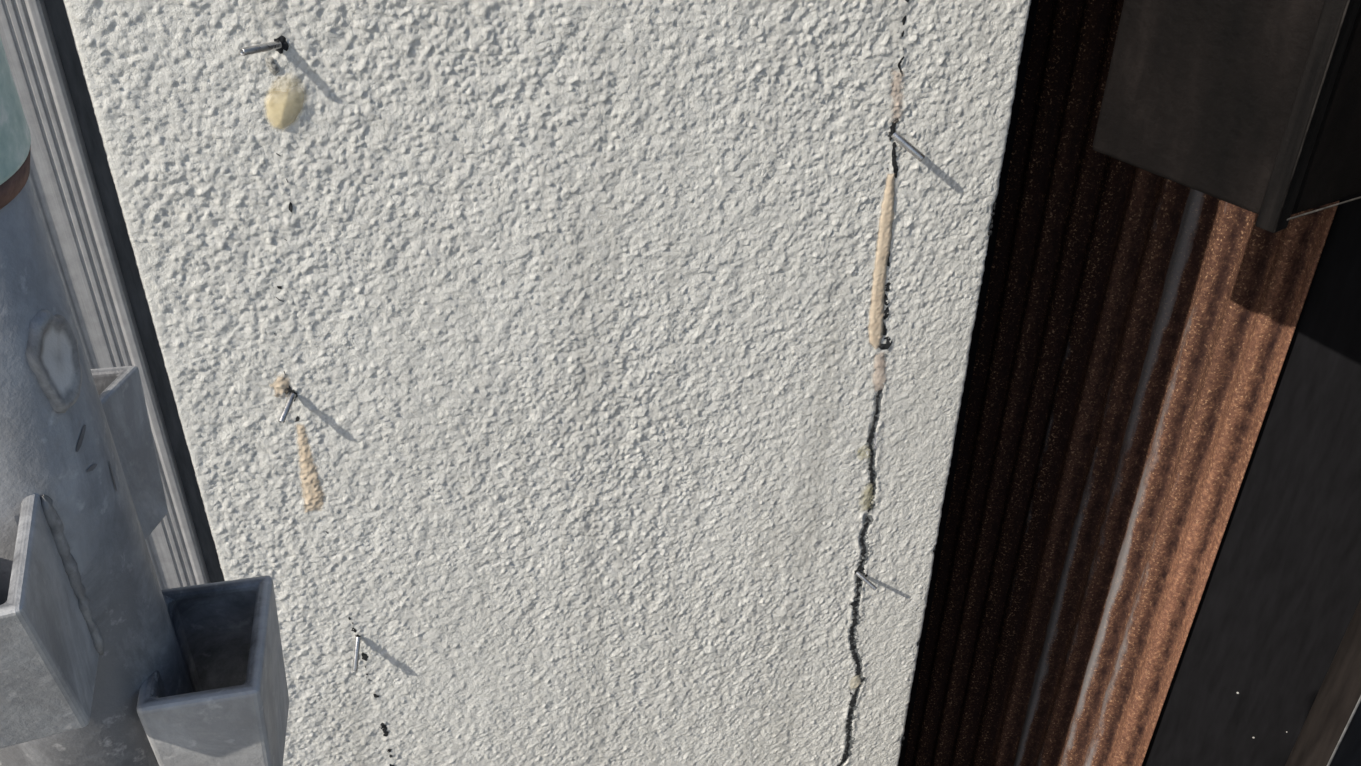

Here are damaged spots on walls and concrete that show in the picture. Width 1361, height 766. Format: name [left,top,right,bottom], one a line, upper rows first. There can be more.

crack [898,0,909,76]
crack [887,118,899,178]
crack [838,227,893,766]